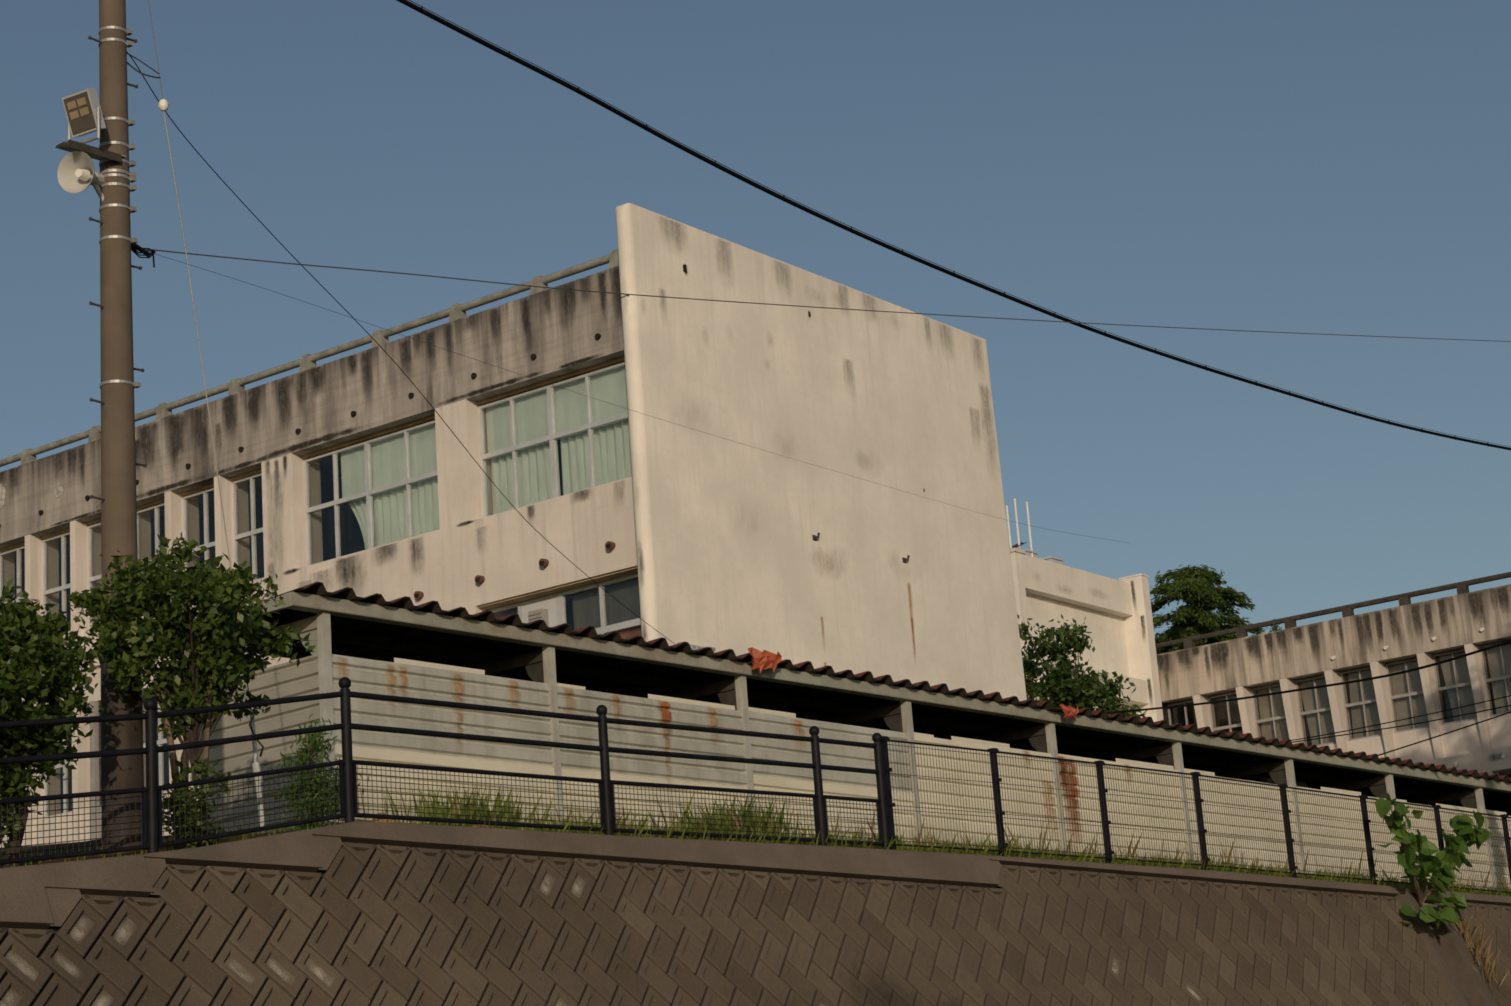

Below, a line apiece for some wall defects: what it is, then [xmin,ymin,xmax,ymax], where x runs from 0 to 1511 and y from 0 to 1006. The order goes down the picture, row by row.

leakage [523,270,621,338]
leakage [401,316,472,367]
leakage [223,388,260,429]
leakage [278,367,324,418]
leakage [348,353,371,385]
leakage [447,373,538,402]
leakage [135,408,206,466]
leakage [218,428,354,474]
leakage [1245,587,1508,654]
leakage [1147,643,1229,698]
rust [660,702,671,752]
rust [1048,757,1079,830]